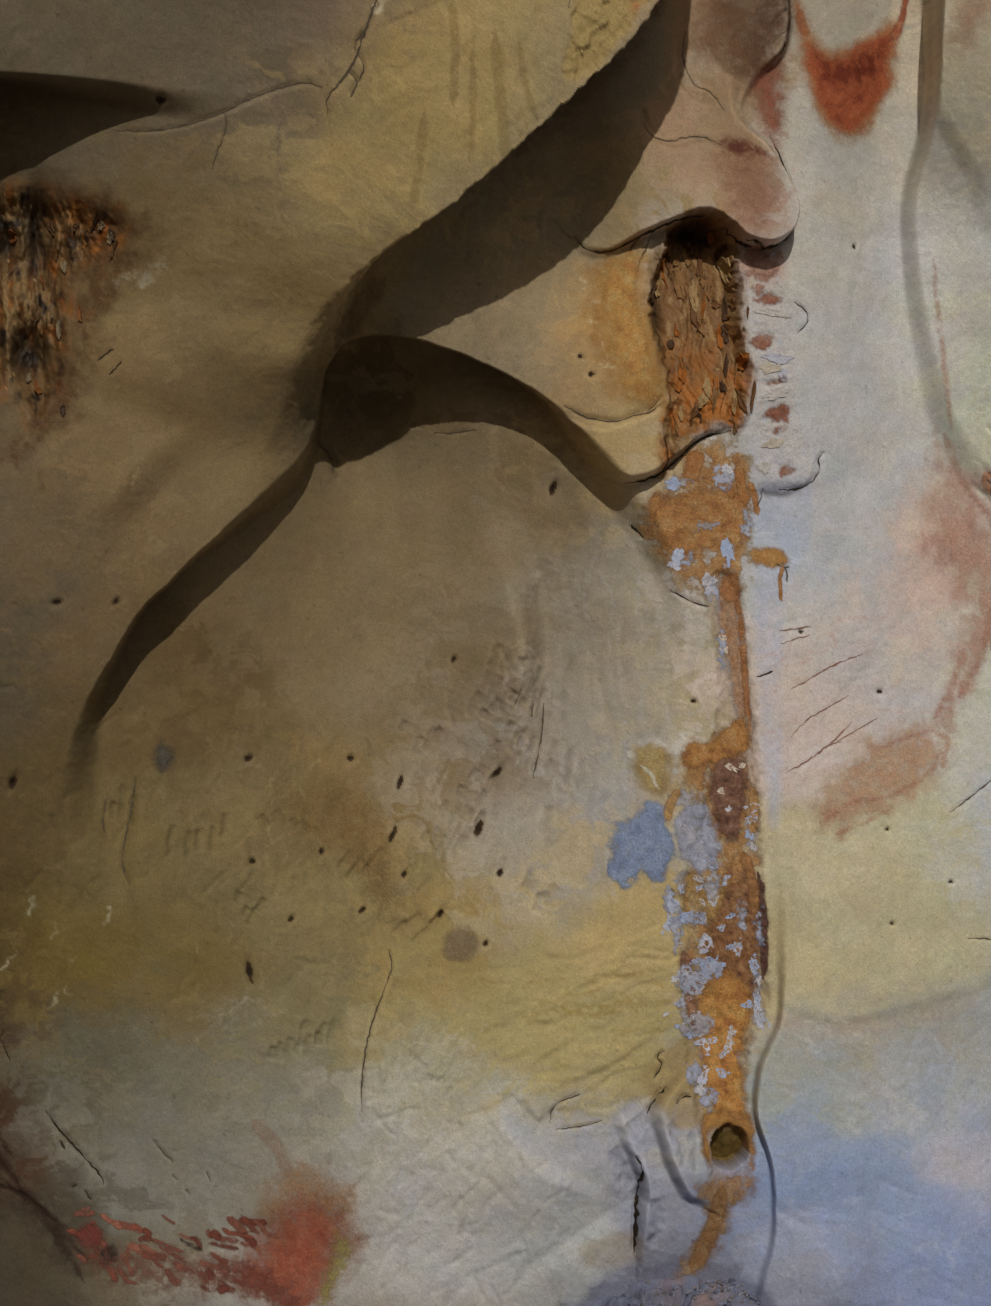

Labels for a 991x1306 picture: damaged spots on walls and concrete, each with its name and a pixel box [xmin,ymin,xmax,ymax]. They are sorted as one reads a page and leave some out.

crack [115,0,377,169]
spalling [564,0,650,82]
corrosion [698,0,908,135]
peeling [667,548,693,571]
peeling [694,509,754,601]
peeling [716,630,728,669]
corrosion [635,436,788,1276]
peeling [607,787,771,1113]
crack [361,948,392,1103]
corrosion [0,1145,359,1306]
crack [633,1157,644,1253]